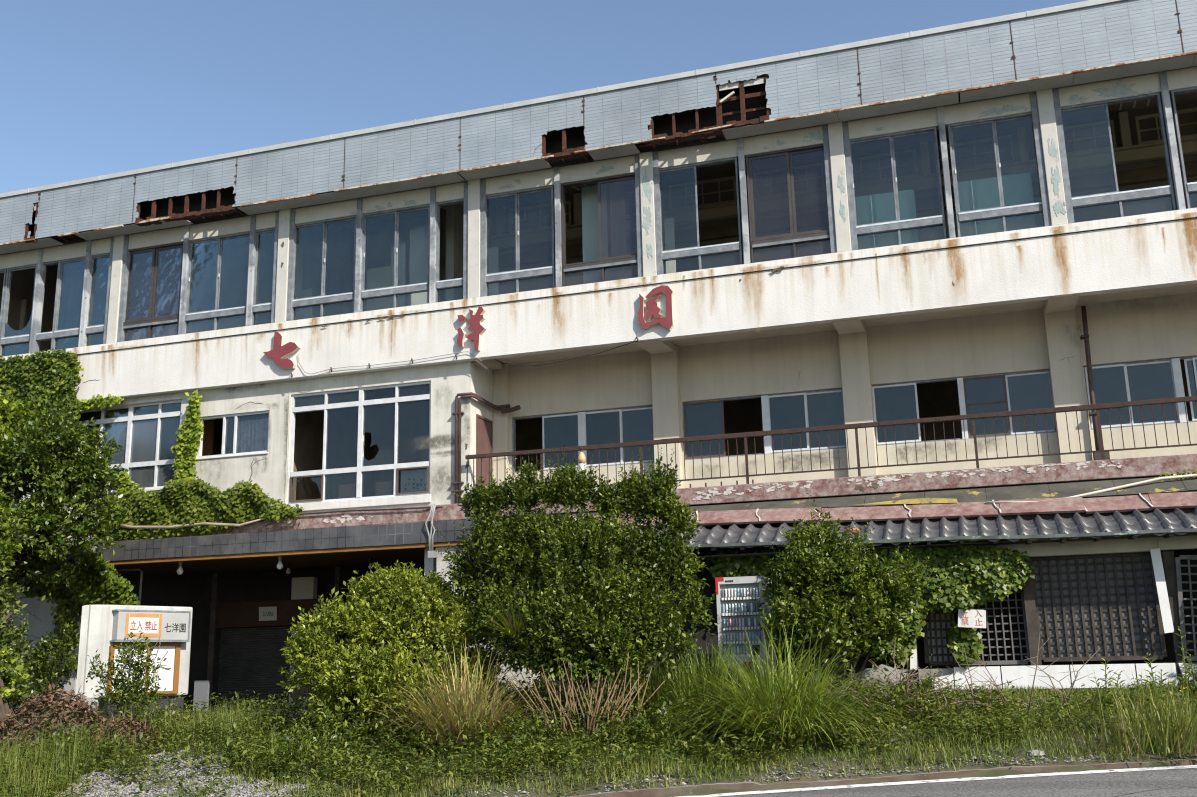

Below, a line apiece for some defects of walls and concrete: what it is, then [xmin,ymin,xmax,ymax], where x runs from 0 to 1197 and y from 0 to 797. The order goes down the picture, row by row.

corrosion [1183,212,1197,256]
corrosion [948,239,961,281]